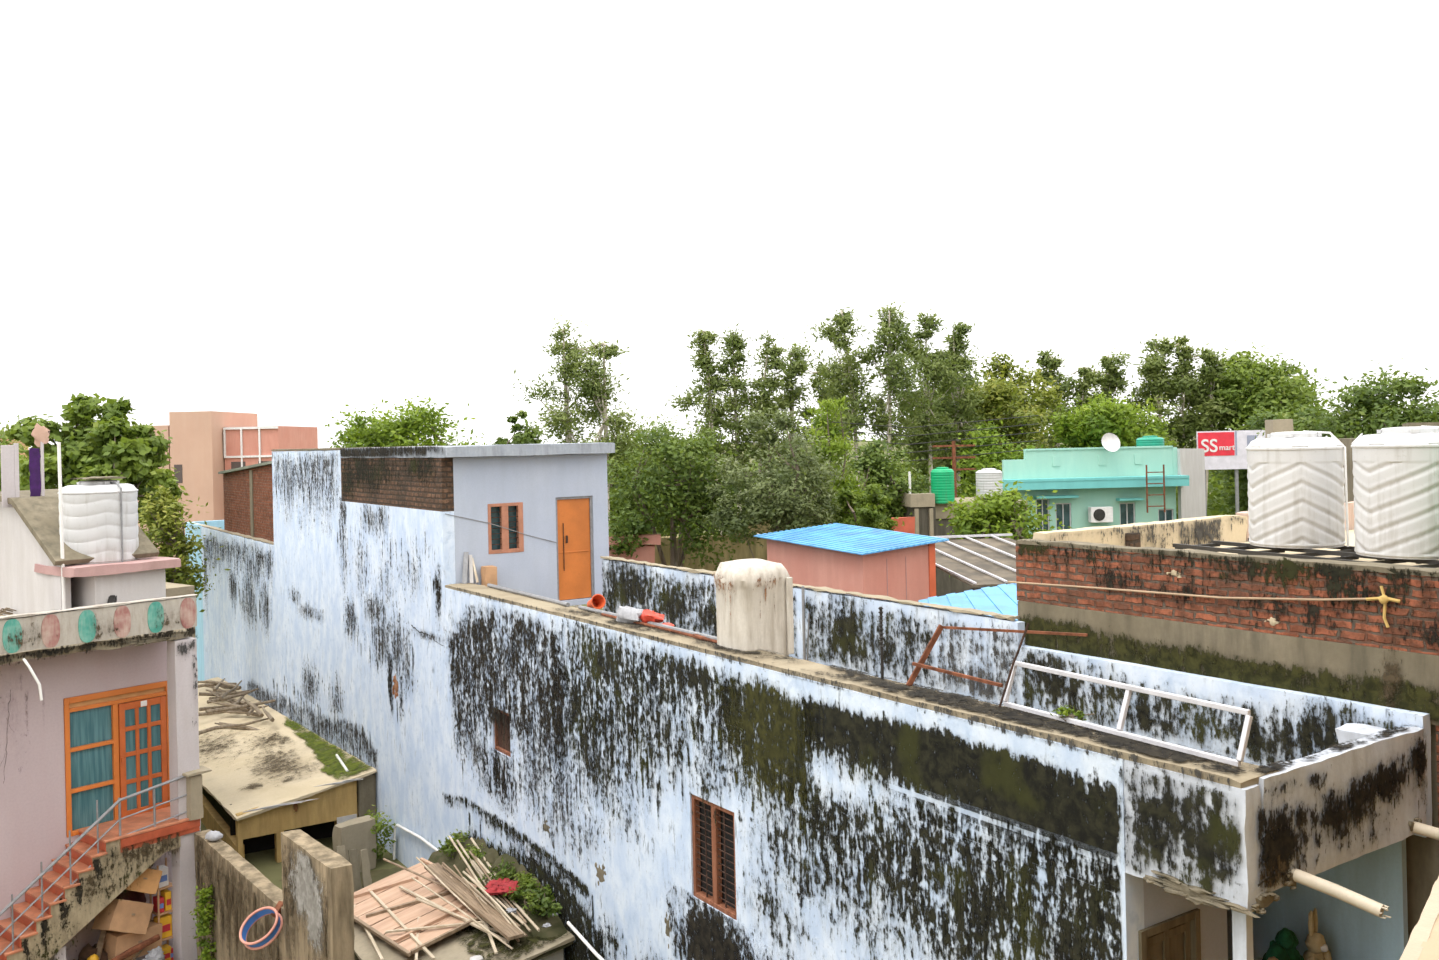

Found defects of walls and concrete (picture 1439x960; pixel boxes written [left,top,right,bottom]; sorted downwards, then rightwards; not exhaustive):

leakage [192,663,378,789]
leakage [272,445,1439,960]
leakage [21,832,179,960]
leakage [195,841,329,960]